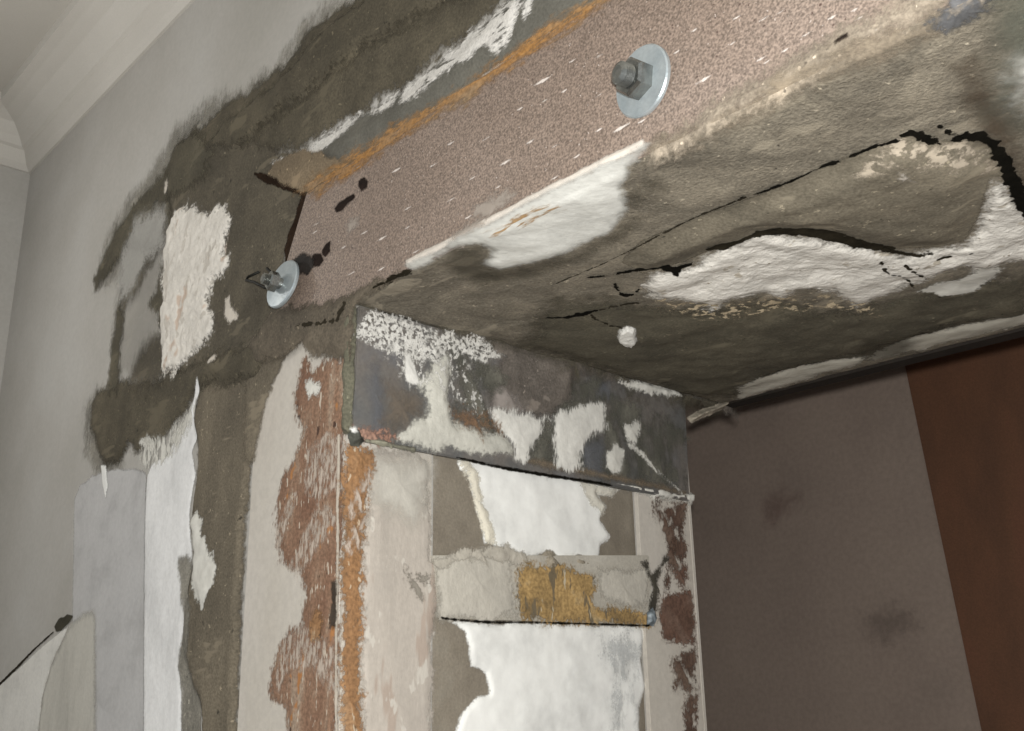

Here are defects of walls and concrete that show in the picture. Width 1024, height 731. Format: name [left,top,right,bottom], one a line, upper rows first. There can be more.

peeling [119,203,238,378]
rust [298,0,607,196]
crack [547,125,1024,329]
spalling [641,184,1024,319]
spalling [857,138,999,181]
rust [268,355,396,731]
peeling [458,460,497,545]
peeling [580,482,619,517]
rust [516,500,699,731]